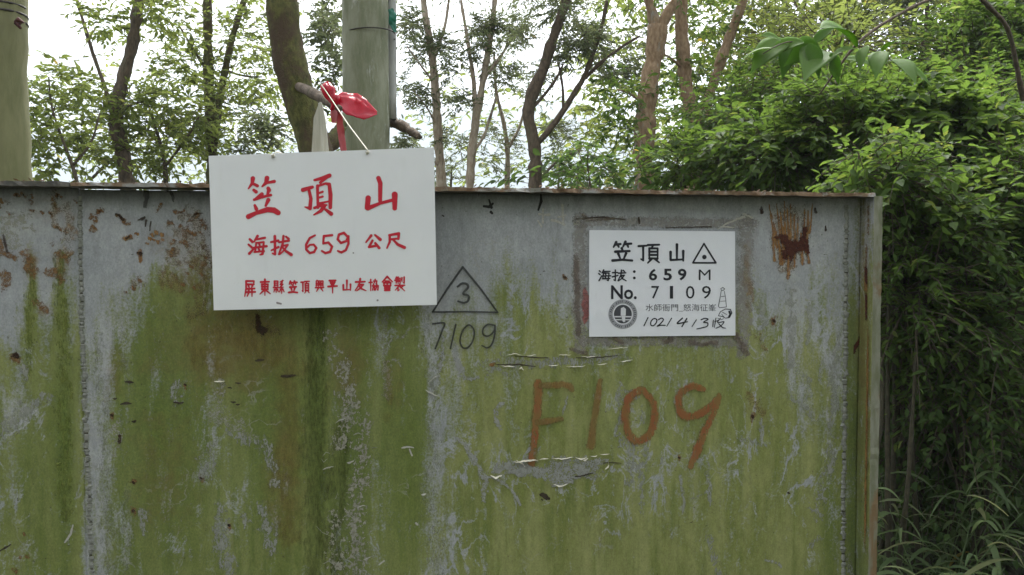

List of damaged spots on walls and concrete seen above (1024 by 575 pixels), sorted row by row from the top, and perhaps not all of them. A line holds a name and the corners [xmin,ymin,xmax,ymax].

corrosion [759,201,818,279]
corrosion [0,190,212,522]
peeling [479,347,633,378]
peeling [455,436,621,506]